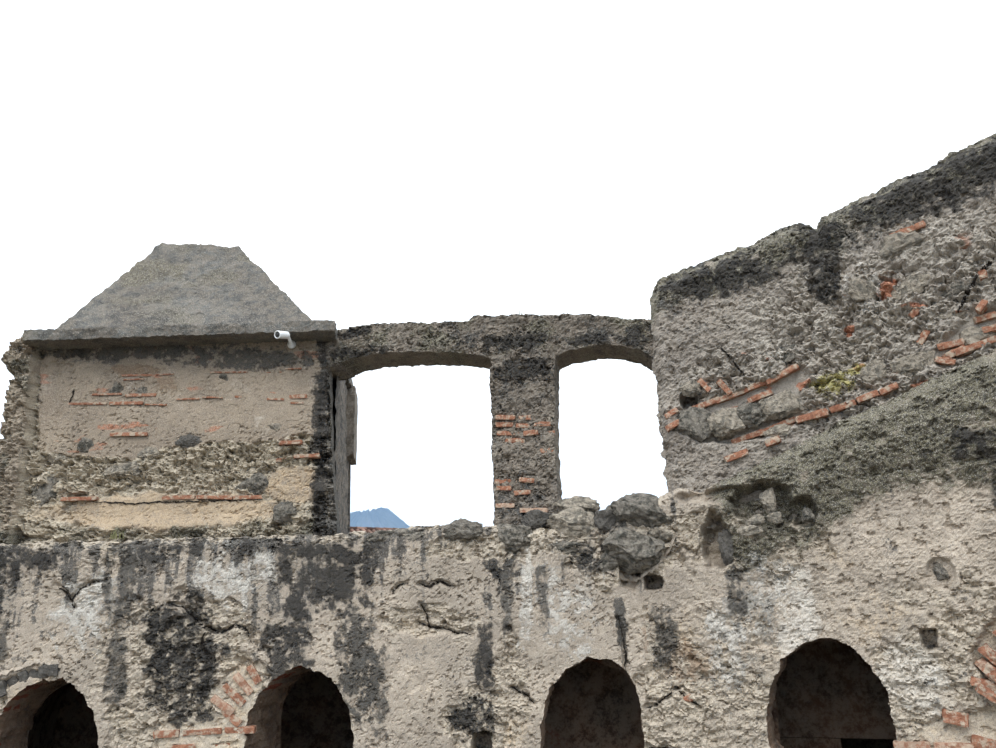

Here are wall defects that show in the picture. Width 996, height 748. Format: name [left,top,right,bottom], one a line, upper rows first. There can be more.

spalling [14,349,337,528]
water stain [19,325,390,739]
crack [392,580,470,635]
spalling [153,660,271,748]
spalling [893,609,996,748]